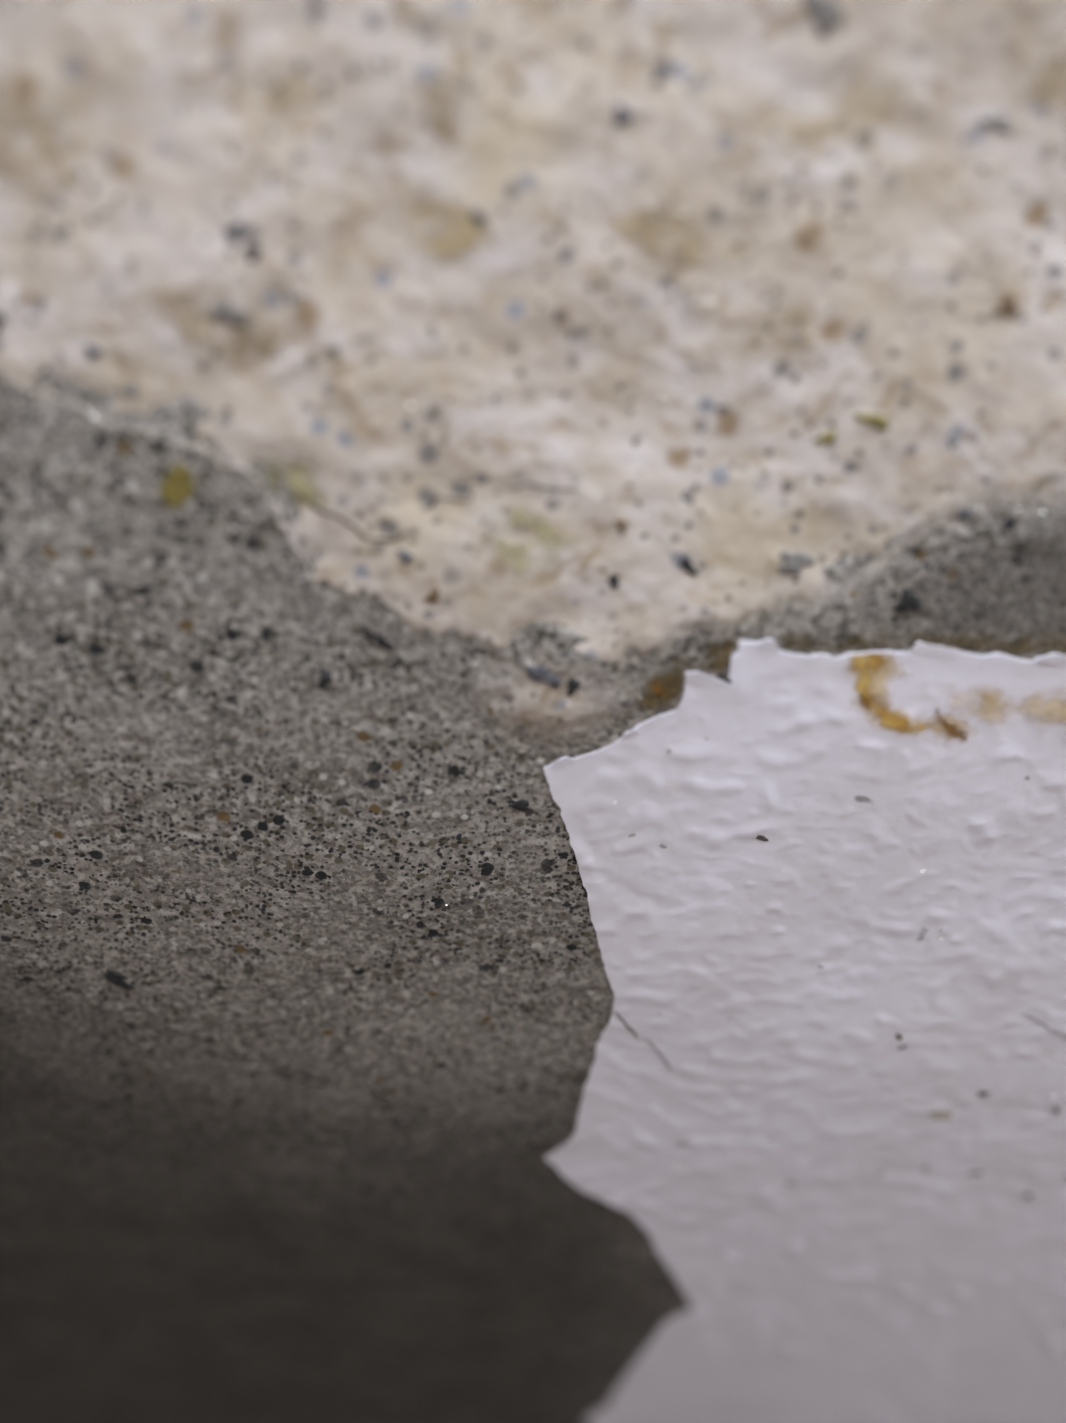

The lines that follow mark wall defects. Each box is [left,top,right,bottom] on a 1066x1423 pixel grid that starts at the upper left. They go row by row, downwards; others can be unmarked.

peeling [544,638,1066,1423]